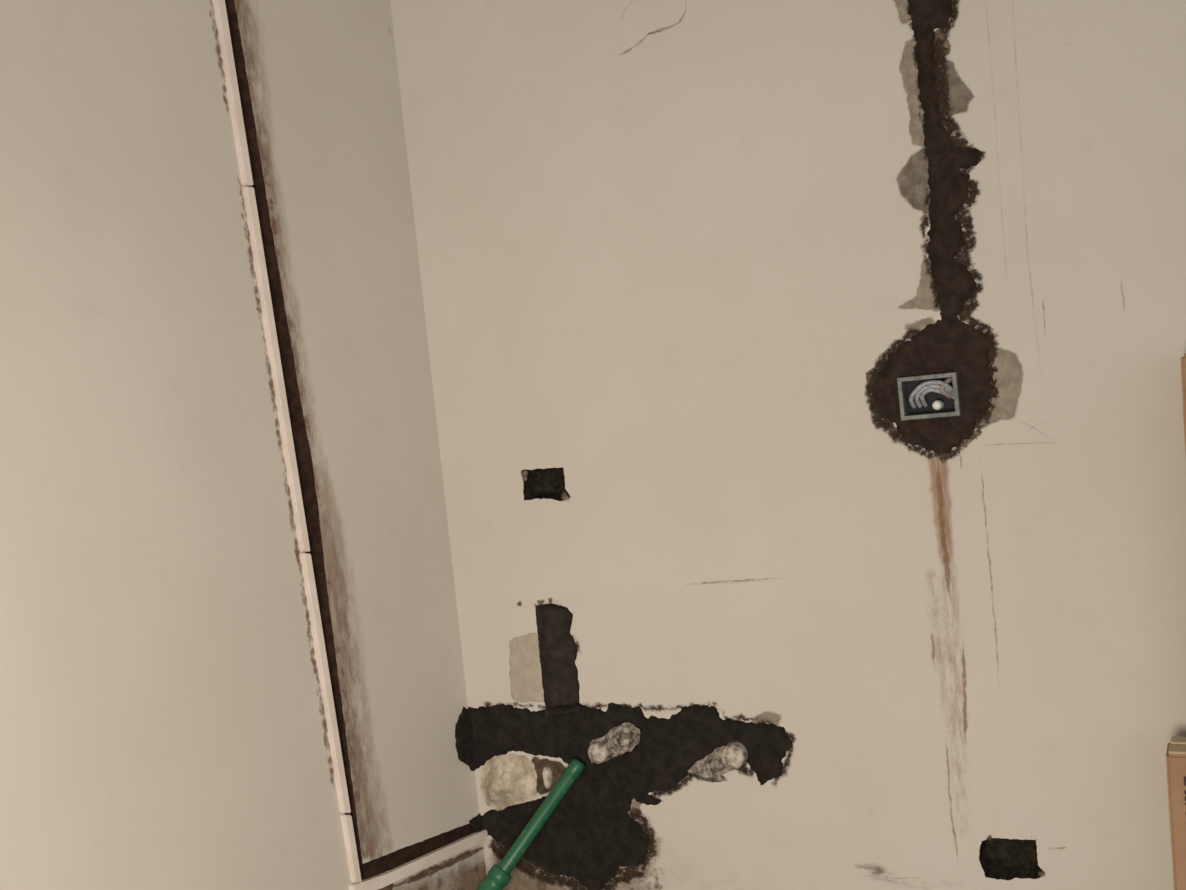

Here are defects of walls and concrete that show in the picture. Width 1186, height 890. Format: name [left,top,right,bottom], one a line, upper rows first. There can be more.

spalling [865,315,1022,461]
rust [932,460,951,591]
spalling [455,702,795,890]